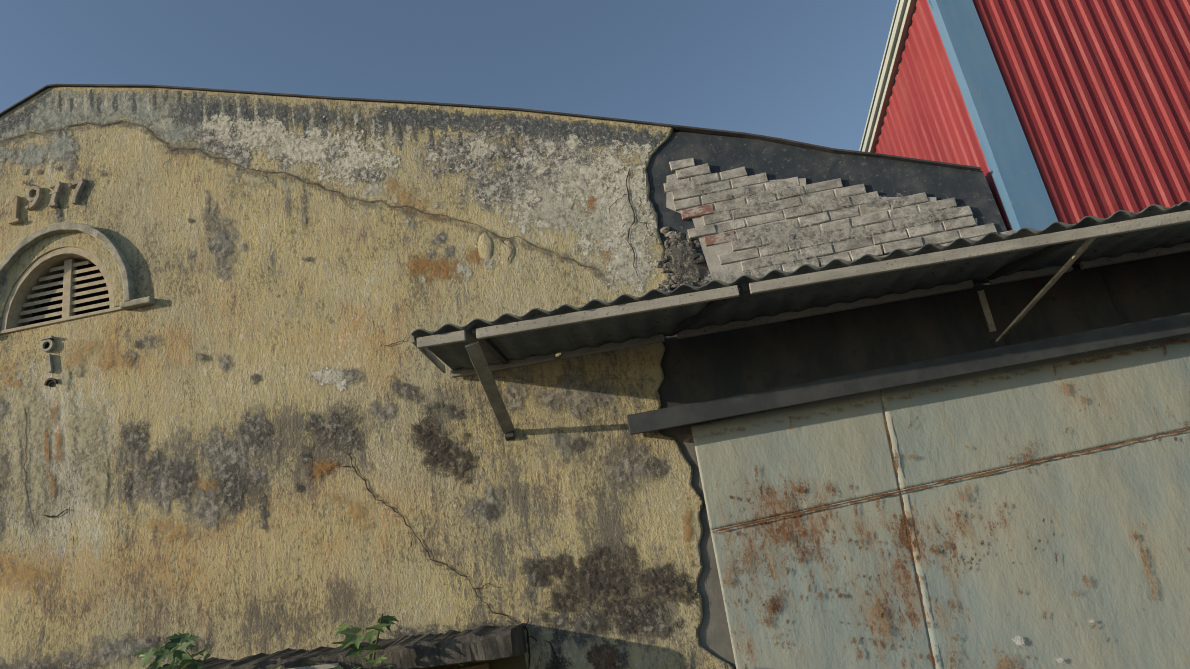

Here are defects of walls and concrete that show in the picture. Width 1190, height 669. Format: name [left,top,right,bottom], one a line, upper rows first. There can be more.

crack [0,116,650,285]
flaking render [190,111,1017,295]
leakage [0,365,280,539]
leakage [196,353,233,372]
peeling [308,367,363,392]
leakage [297,376,477,484]
crack [329,452,568,669]
leakage [519,545,698,669]
rust [710,393,1190,649]